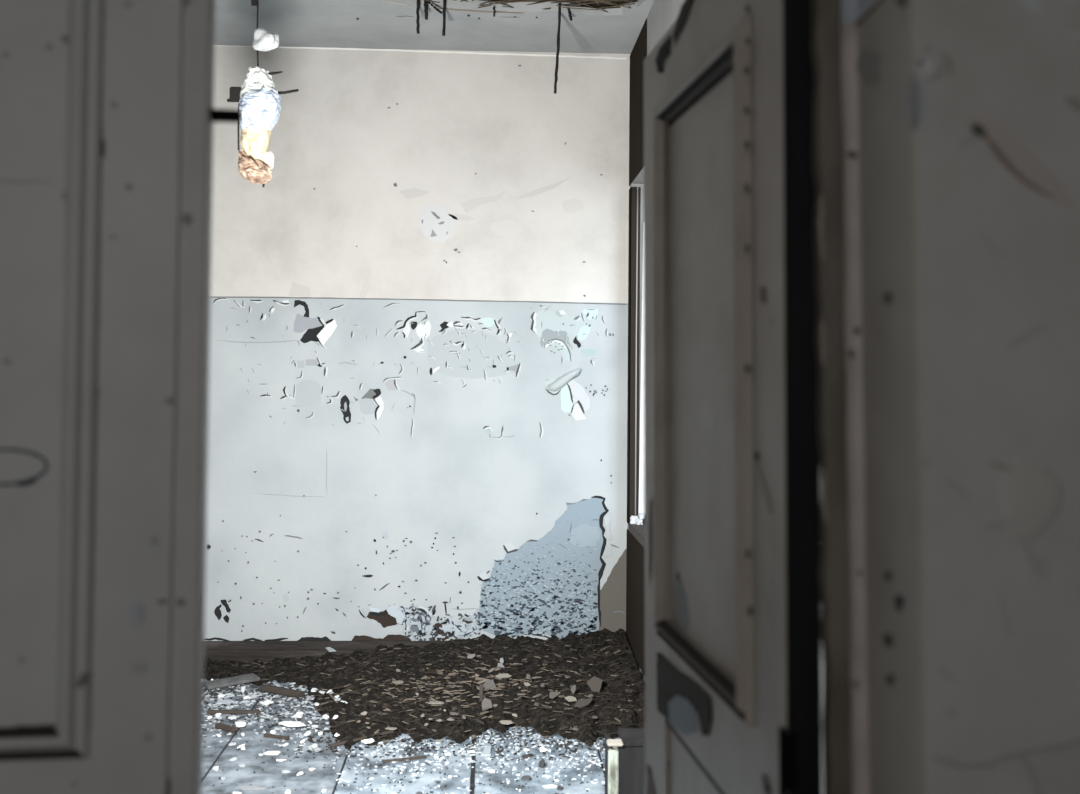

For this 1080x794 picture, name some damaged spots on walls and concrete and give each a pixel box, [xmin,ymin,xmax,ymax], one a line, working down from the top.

peeling [251,300,324,343]
peeling [403,317,519,379]
peeling [534,308,599,362]
peeling [340,379,398,424]
peeling [561,380,590,421]
flaking render [352,498,612,641]
peeling [214,599,231,623]